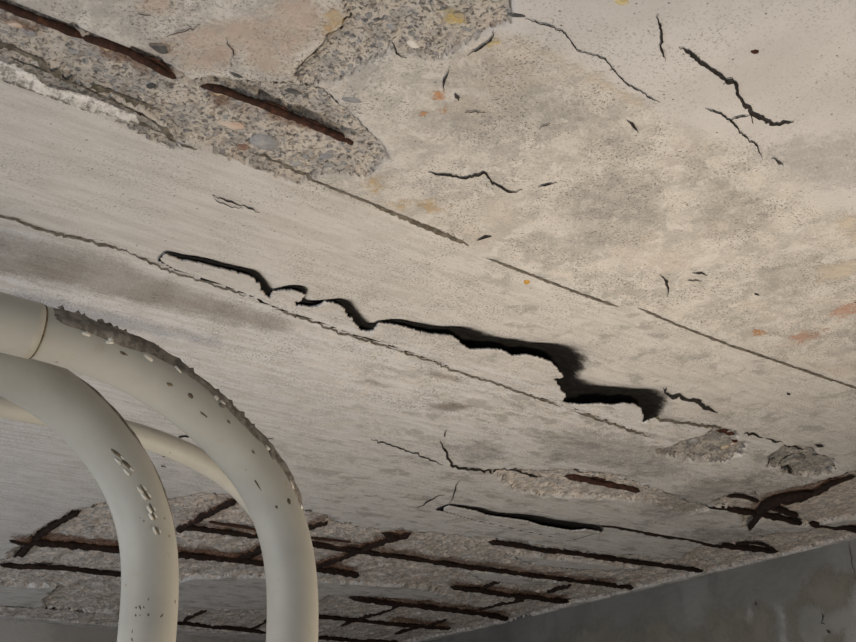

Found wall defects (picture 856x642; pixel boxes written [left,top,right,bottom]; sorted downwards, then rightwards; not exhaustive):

spalling [0,0,525,185]
crack [526,18,660,103]
crack [656,14,793,165]
crack [429,172,556,193]
crack [157,252,718,436]
spalling [52,305,856,642]
crack [371,430,603,540]
spalling [0,502,121,625]